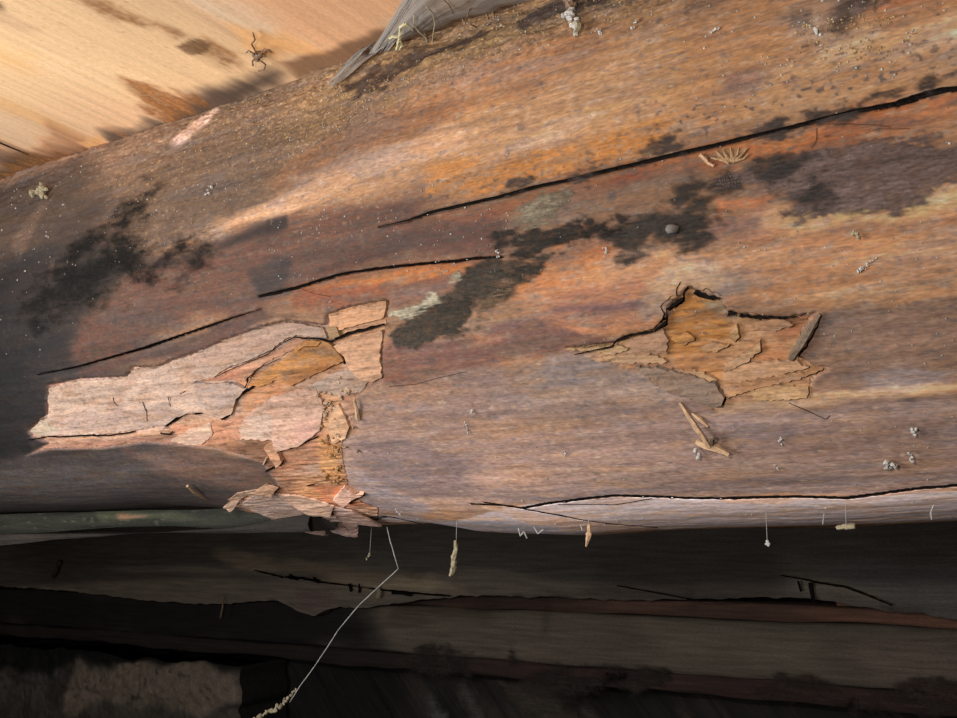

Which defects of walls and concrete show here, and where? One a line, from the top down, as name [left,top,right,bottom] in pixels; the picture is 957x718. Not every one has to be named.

crack [378,86,957,227]
water stain [759,117,788,141]
water stain [803,108,860,128]
water stain [23,188,211,332]
crack [28,323,385,440]
peeling [30,300,389,468]
crack [37,256,503,375]
water stain [389,129,957,349]
crack [574,282,798,355]
peeling [566,318,824,409]
peeling [333,485,364,507]
crack [470,484,957,528]